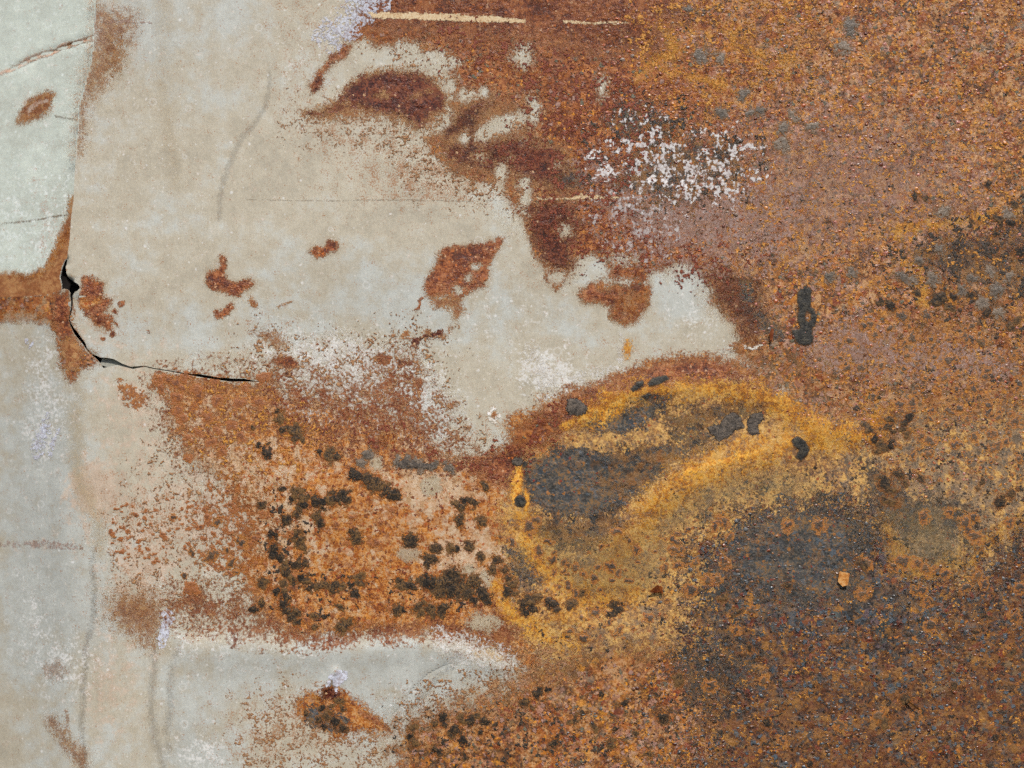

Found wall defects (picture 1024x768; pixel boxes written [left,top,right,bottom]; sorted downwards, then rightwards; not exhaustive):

corrosion [15,88,56,126]
corrosion [308,239,339,259]
corrosion [0,194,125,384]
corrosion [205,254,259,320]
corrosion [412,236,505,321]
corrosion [250,328,288,351]
crack [101,358,258,382]
corrosion [265,353,300,369]
corrosion [487,407,501,424]